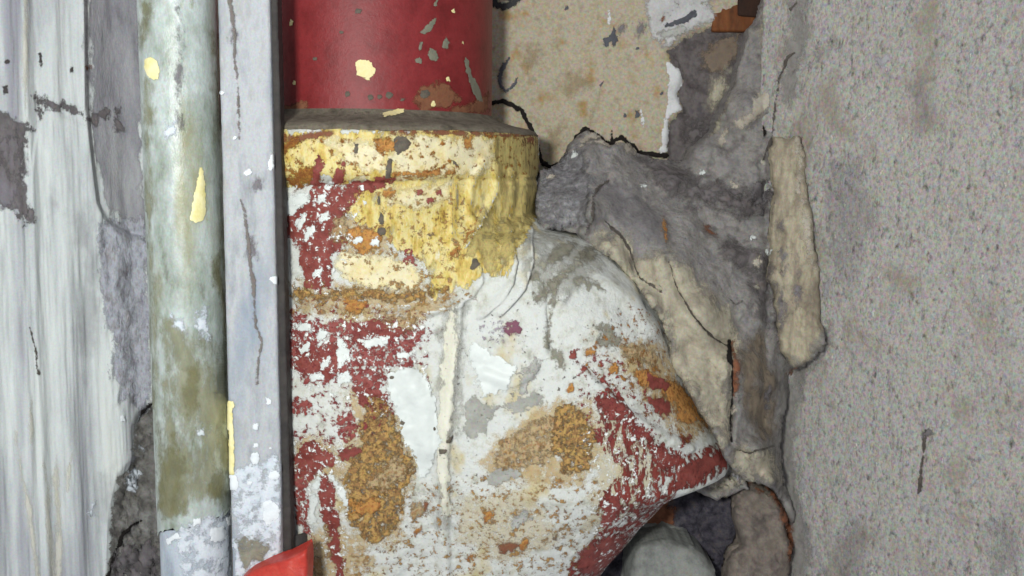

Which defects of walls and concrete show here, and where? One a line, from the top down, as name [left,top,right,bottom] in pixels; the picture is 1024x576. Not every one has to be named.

crack [492,98,669,168]
peeling [287,135,411,295]
peeling [0,0,161,576]
damp [157,434,185,518]
damp [184,368,198,408]
peeling [290,308,453,576]
rust [293,382,664,576]
peeling [468,342,517,398]
peeling [573,492,628,576]
rust [583,305,712,442]
peeling [598,369,741,490]
crack [585,180,773,454]